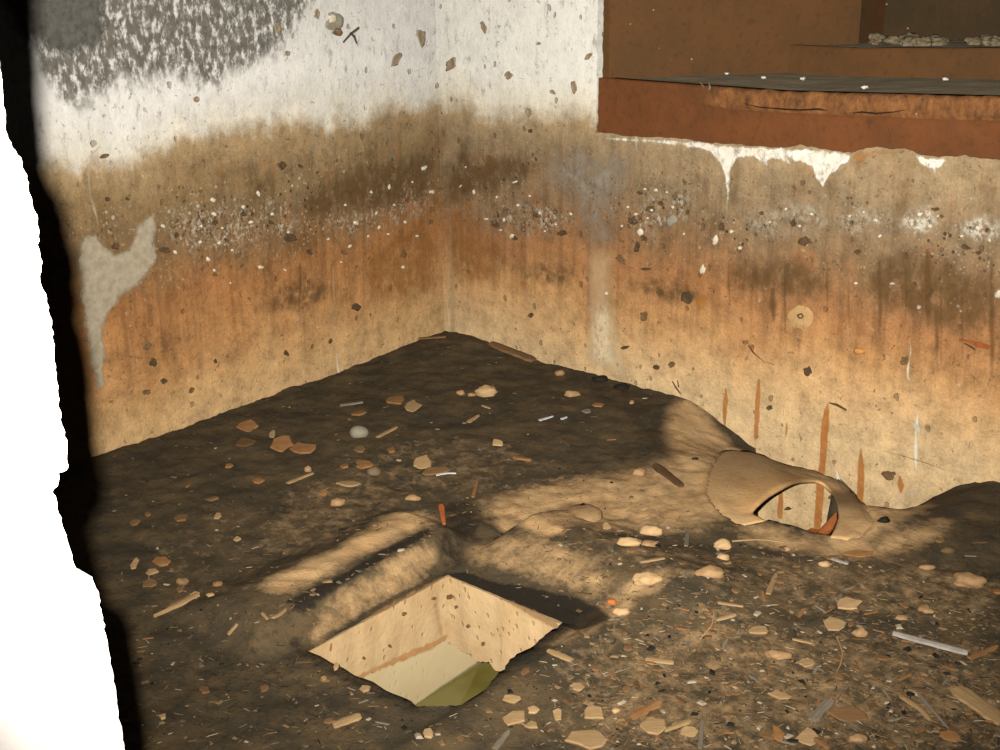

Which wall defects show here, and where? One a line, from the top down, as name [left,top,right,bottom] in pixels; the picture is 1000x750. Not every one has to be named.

mould [35,0,305,105]
leakage [306,162,425,212]
leakage [452,155,527,195]
efflorescence [614,137,850,192]
efflorescence [918,156,945,171]
leakage [592,258,615,366]
leakage [734,265,816,313]
leakage [873,260,993,340]
rust [815,405,829,530]